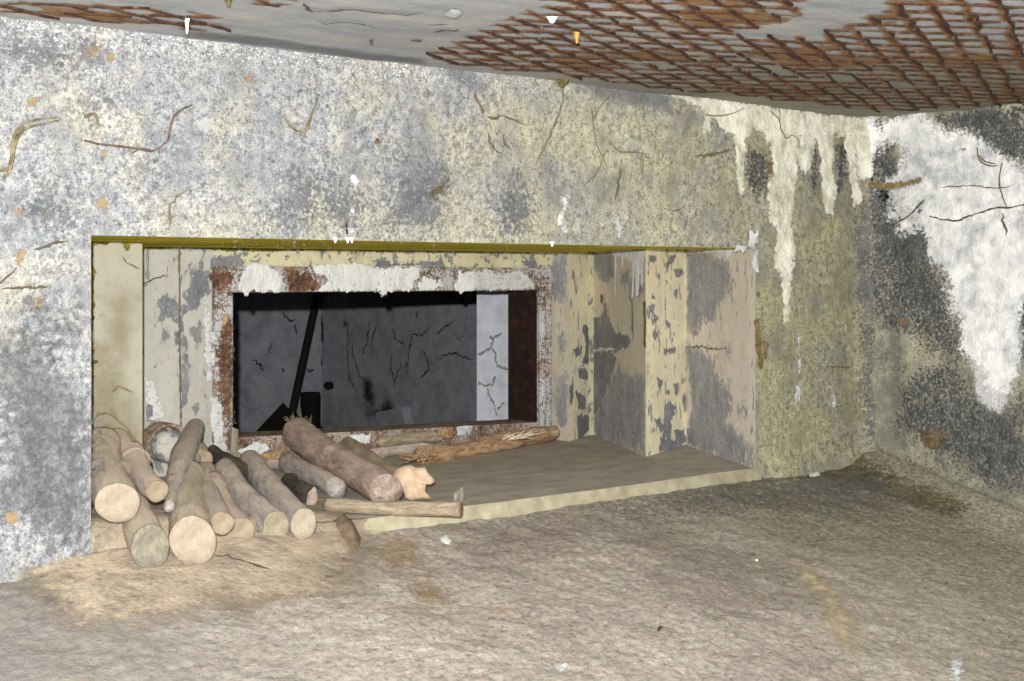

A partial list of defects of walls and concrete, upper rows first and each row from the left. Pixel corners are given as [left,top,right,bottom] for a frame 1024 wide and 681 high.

rust [0,2,231,32]
crack [474,92,511,154]
crack [614,166,622,200]
crack [891,184,1024,237]
rust [209,272,234,291]
leakage [587,85,1024,494]
peeling [143,270,211,416]
rust [216,314,236,448]
crack [253,311,508,416]
peeling [551,249,755,468]